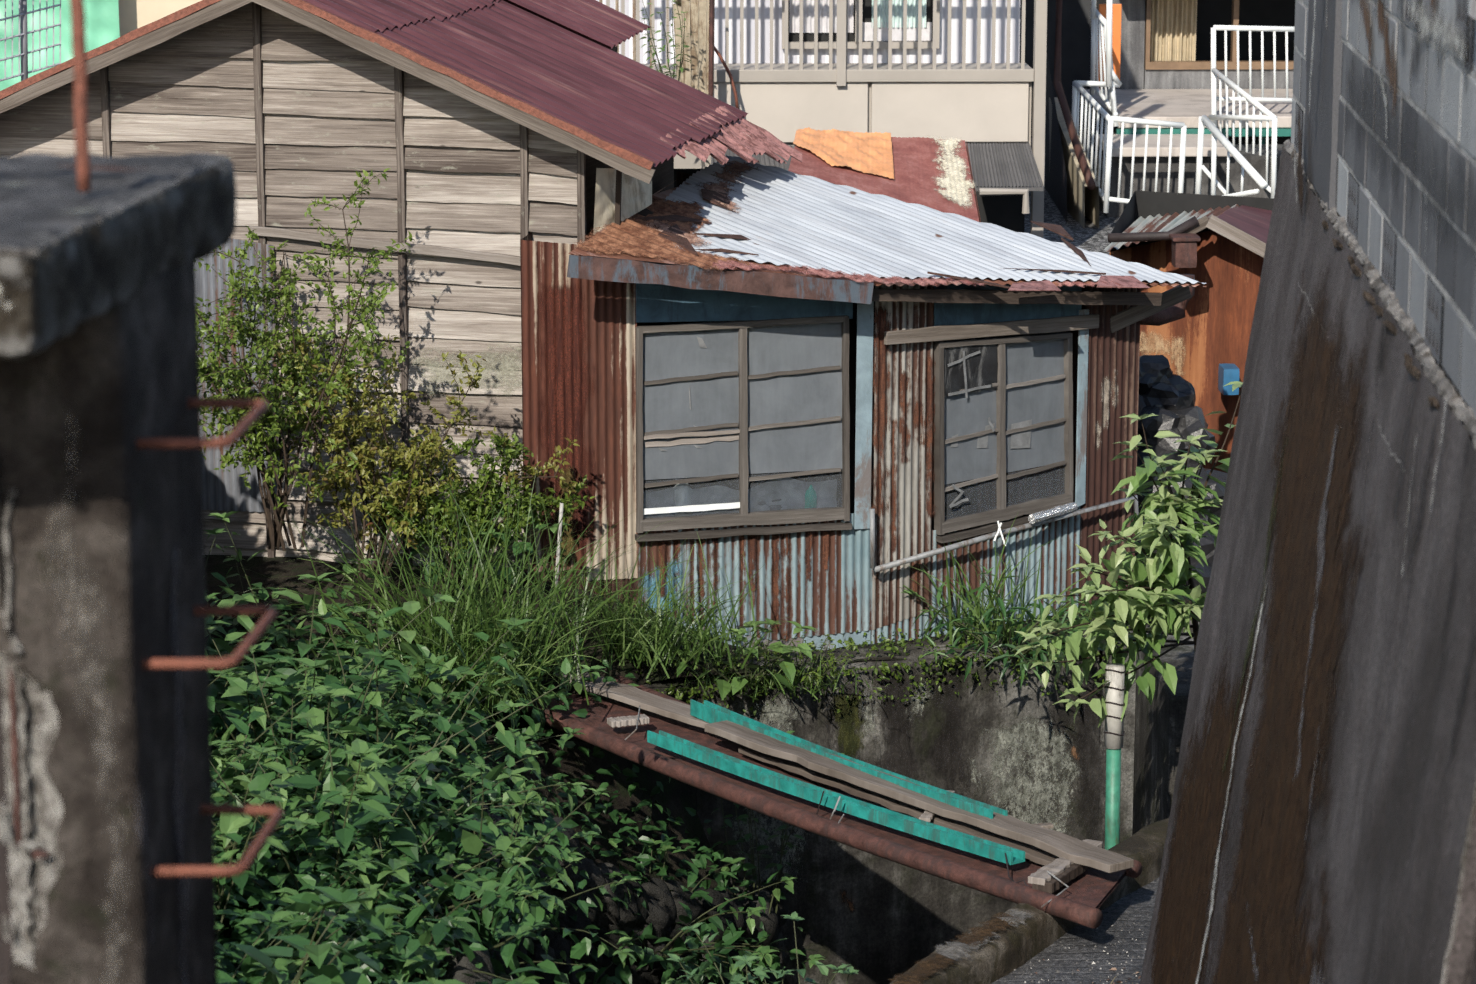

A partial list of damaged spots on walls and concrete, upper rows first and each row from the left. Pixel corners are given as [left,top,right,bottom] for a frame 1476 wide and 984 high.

corrosion [577,161,984,286]
corrosion [538,285,598,565]
corrosion [871,306,936,604]
spalling [0,642,63,971]
damp [826,668,914,778]
damp [932,669,971,796]
damp [1072,673,1106,841]
damp [1149,257,1384,984]